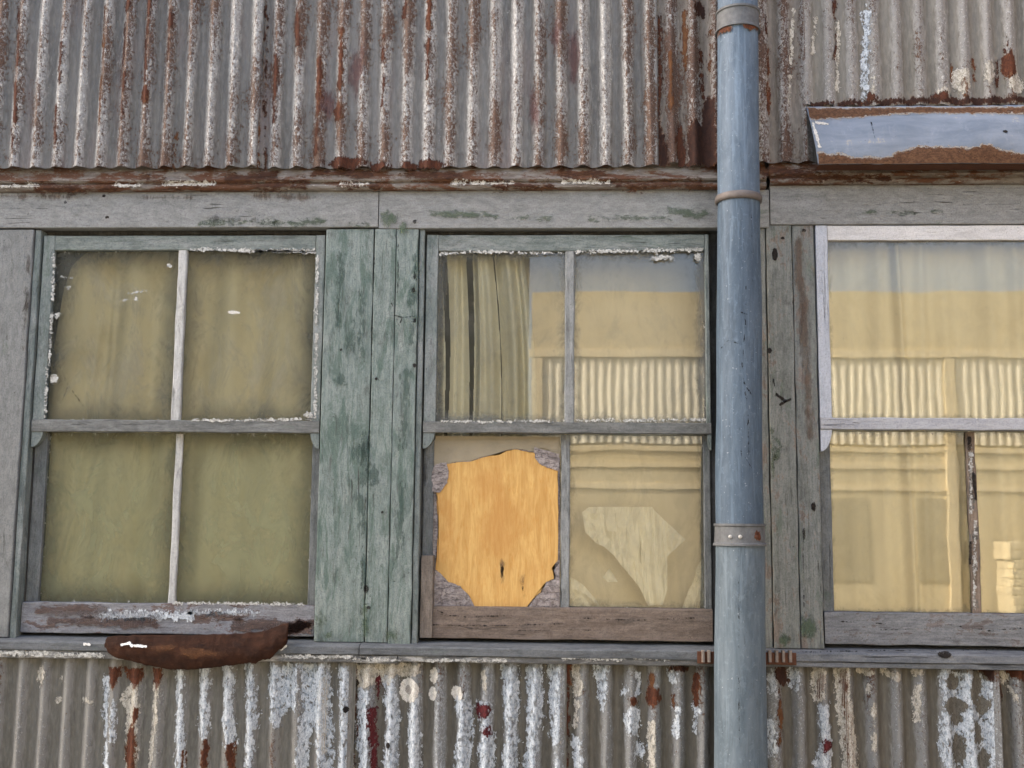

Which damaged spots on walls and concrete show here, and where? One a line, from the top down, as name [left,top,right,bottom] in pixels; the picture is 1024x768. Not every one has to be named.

rust [223,0,465,195]
rust [491,0,772,193]
rust [807,0,1024,121]
peeling [0,643,105,688]
peeling [82,675,159,768]
peeling [98,601,304,623]
rust [104,619,314,690]
rust [354,674,383,768]
peeling [172,645,679,768]
rust [473,700,493,741]
peeling [671,702,702,740]
peeling [936,669,1019,768]